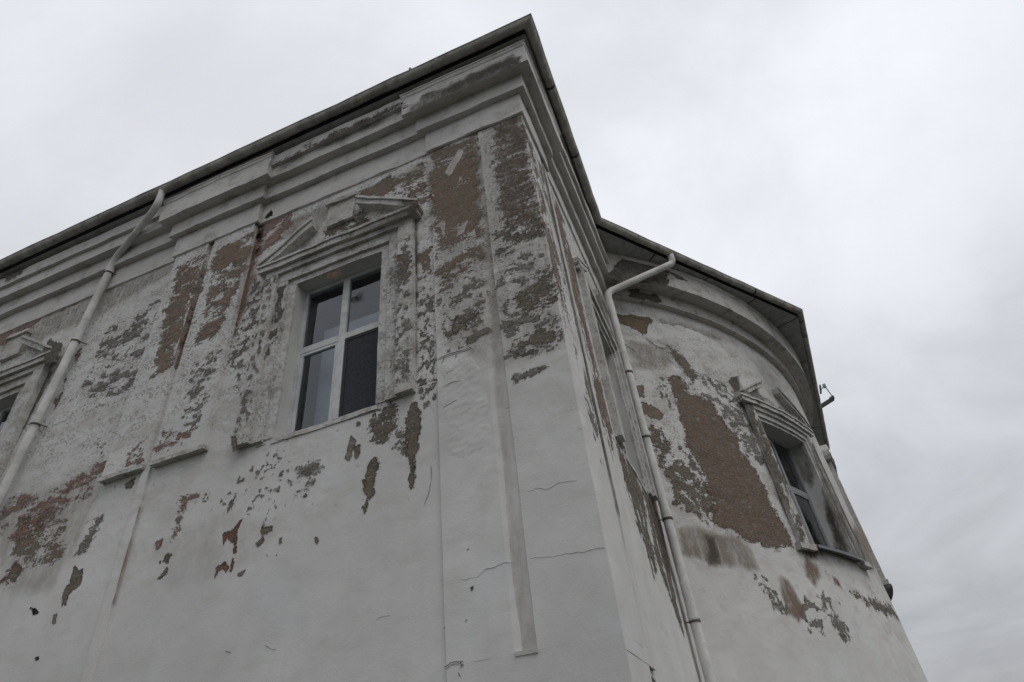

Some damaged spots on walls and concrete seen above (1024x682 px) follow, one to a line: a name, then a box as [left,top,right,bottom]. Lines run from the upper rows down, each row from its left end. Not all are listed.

peeling [0,438,106,624]
peeling [74,212,295,488]
peeling [155,450,325,579]
peeling [344,110,687,637]
flaking render [636,345,809,552]
peeling [754,574,788,616]
peeling [801,592,852,644]
peeling [849,589,902,625]